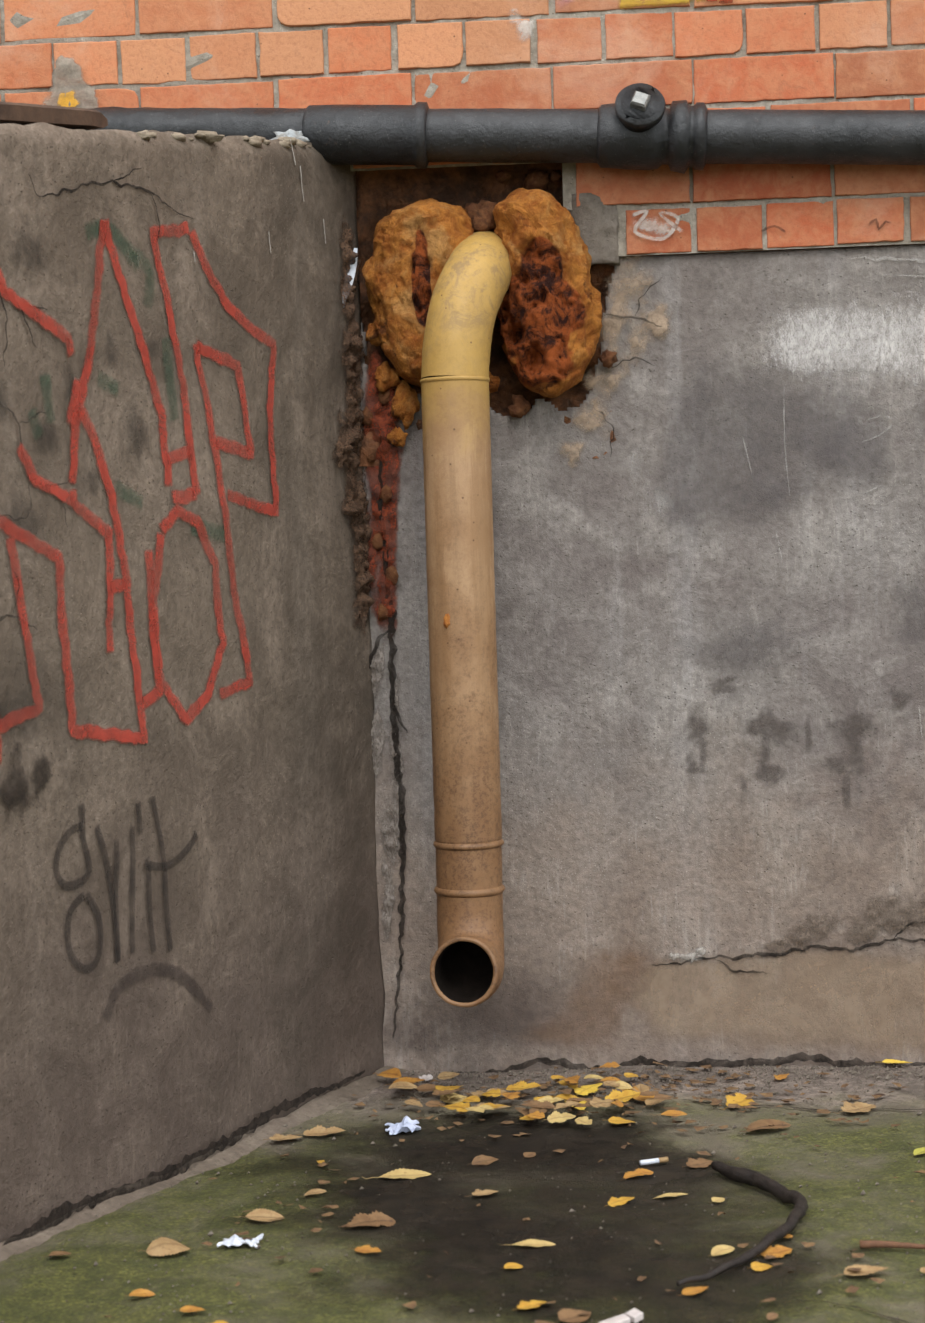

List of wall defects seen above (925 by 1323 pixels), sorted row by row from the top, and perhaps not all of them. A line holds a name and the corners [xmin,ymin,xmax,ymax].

crack [29,168,193,244]
rust [362,352,402,627]
crack [652,921,925,973]